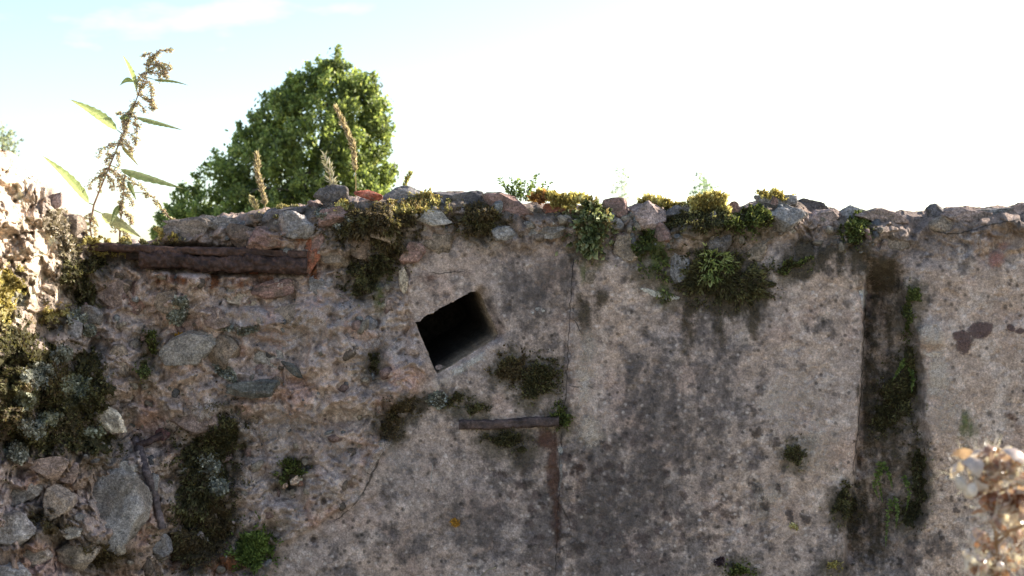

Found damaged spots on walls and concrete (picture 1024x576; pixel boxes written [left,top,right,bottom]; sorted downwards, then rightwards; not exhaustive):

crack [564,256,593,407]
damp [660,281,769,354]
damp [746,405,780,447]
damp [783,236,919,566]
crack [336,439,392,520]
rust [539,429,561,538]
damp [523,447,660,519]